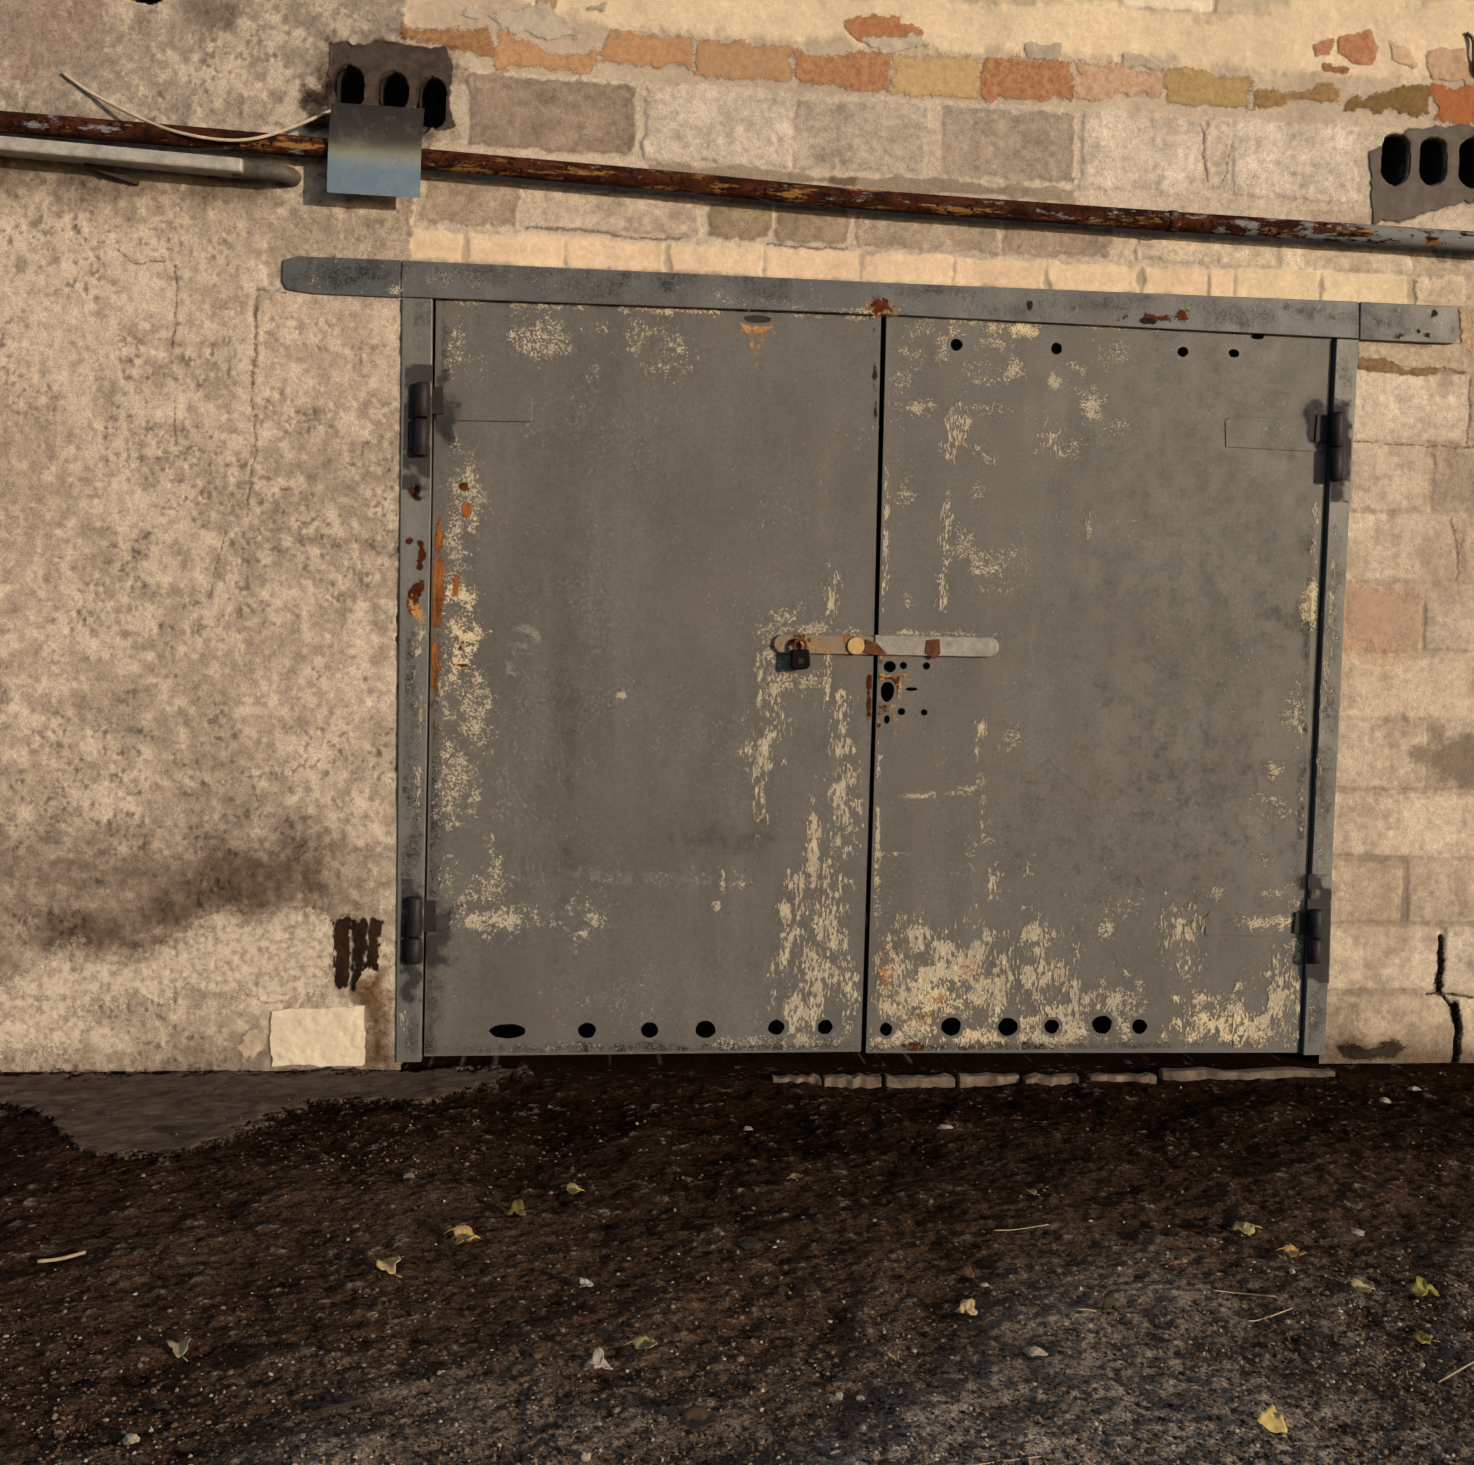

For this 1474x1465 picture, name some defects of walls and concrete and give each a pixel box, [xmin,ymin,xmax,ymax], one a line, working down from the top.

peeling [400,0,1474,125]
rust [1118,310,1189,324]
crack [1354,380,1474,449]
rust [405,518,468,705]
rust [459,481,471,518]
rust [789,634,854,654]
rust [866,656,909,727]
peeling [882,446,917,612]
peeling [930,491,1031,612]
peeling [685,563,1318,1051]
crack [1425,935,1474,1063]